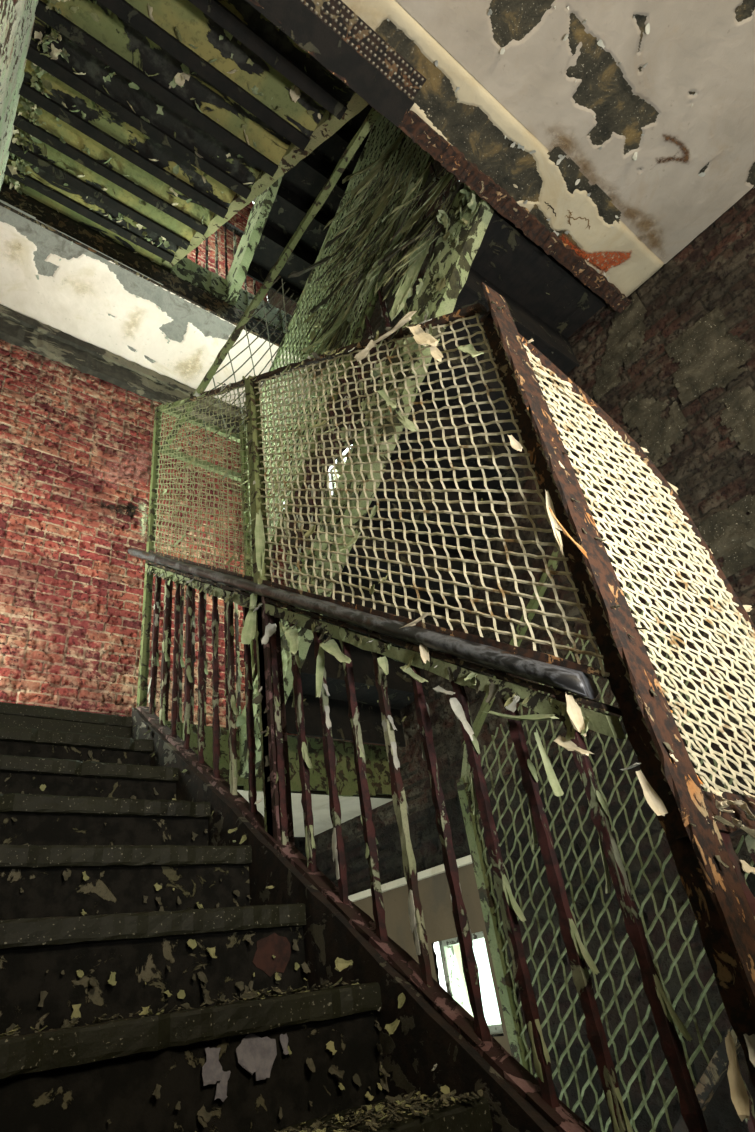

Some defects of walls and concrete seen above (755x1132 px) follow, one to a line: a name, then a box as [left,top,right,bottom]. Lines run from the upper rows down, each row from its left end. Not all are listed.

spalling [735,0,755,22]
spalling [487,0,659,175]
spalling [0,24,236,344]
spalling [375,18,621,280]
rust [560,235,631,274]
peeling [318,177,481,553]
peeling [236,664,270,781]
peeling [433,665,529,712]
peeling [548,698,589,741]
peeling [706,786,755,839]
peeling [335,957,353,972]
peeling [326,993,406,1101]